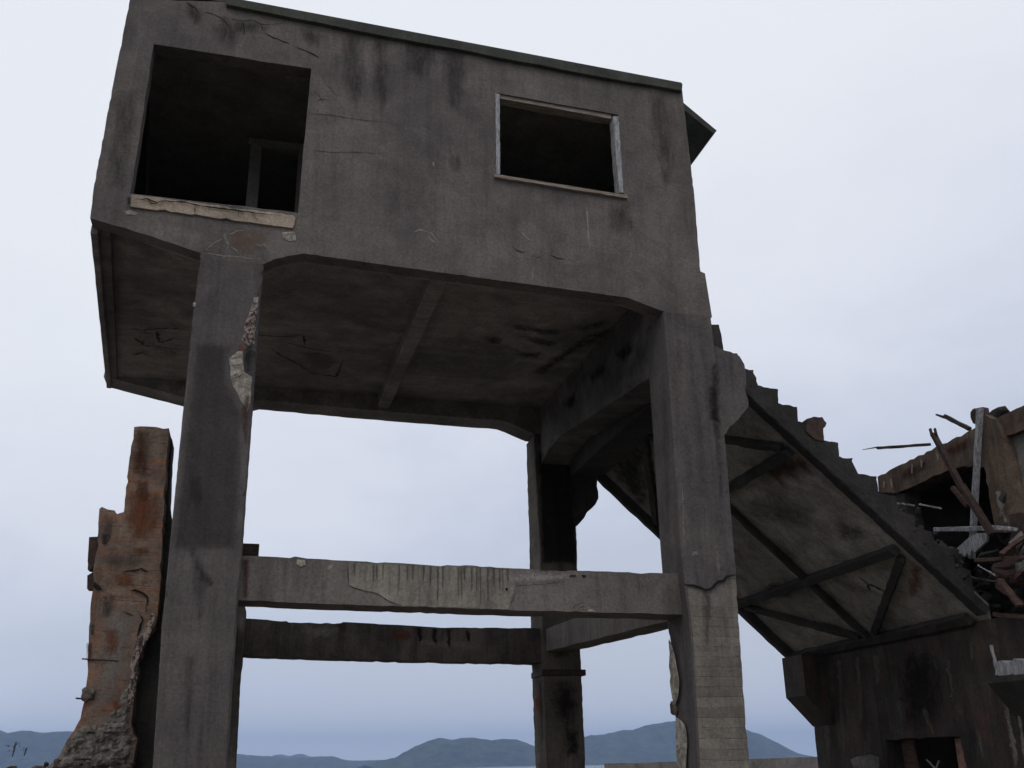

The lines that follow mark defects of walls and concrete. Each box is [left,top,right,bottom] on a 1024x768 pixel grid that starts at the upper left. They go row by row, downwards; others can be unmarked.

crack [185,1,388,123]
crack [140,198,280,259]
spalling [229,297,259,436]
flaking render [348,562,586,609]
spalling [128,612,156,708]
spalling [669,640,687,768]